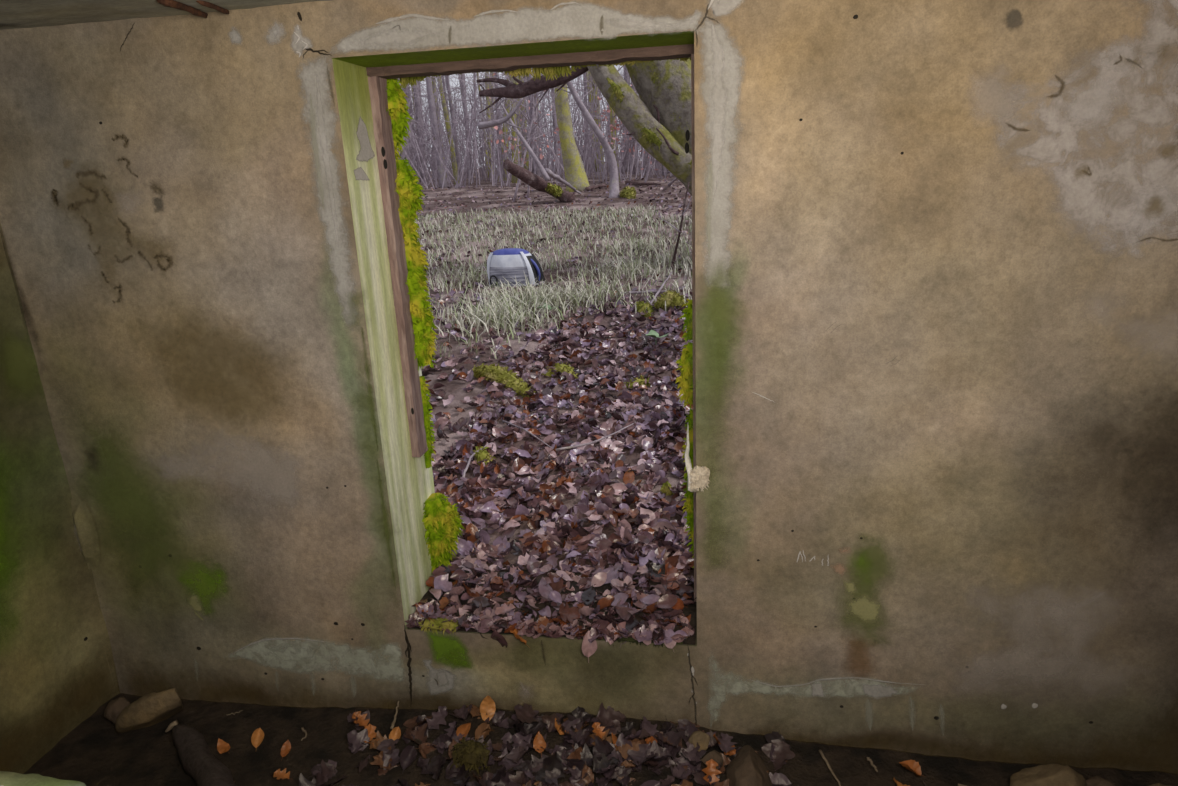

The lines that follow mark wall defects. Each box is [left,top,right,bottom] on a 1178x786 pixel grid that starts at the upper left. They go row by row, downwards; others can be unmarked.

corrosion [156,0,229,18]
crack [695,3,720,44]
leakage [998,0,1178,252]
leakage [833,550,880,621]
crack [404,625,412,707]